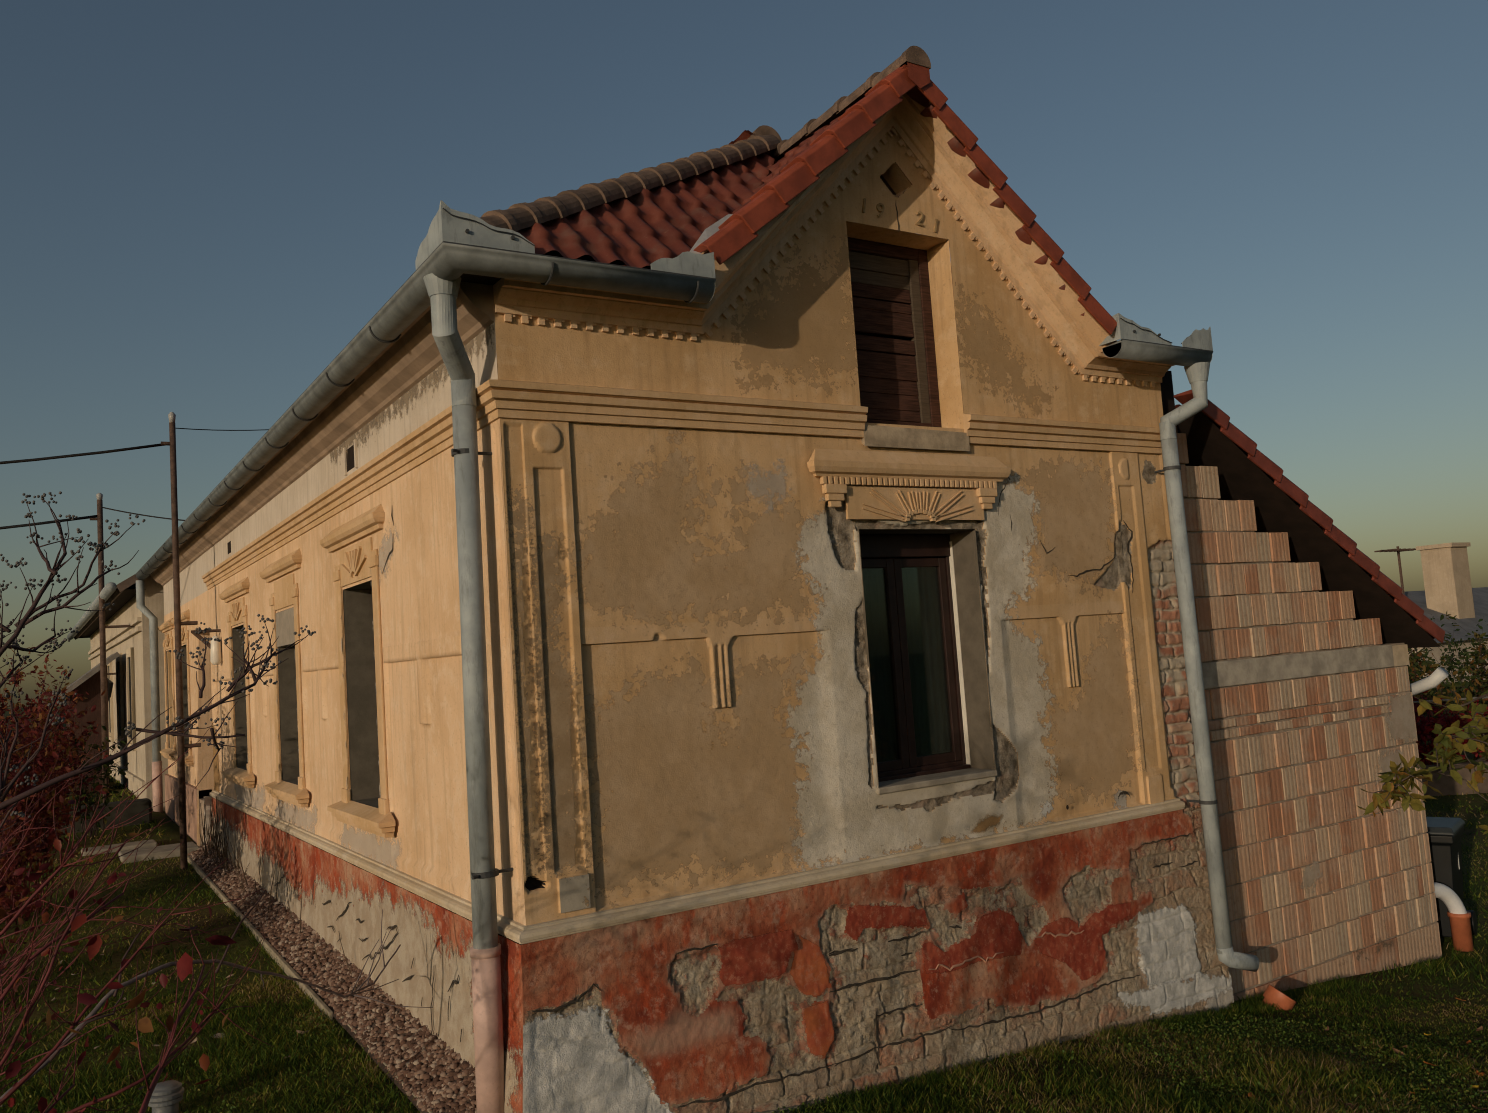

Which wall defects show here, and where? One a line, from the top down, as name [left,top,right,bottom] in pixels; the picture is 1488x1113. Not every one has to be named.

flaking render [210,812,475,1068]
flaking render [504,454,1229,1113]